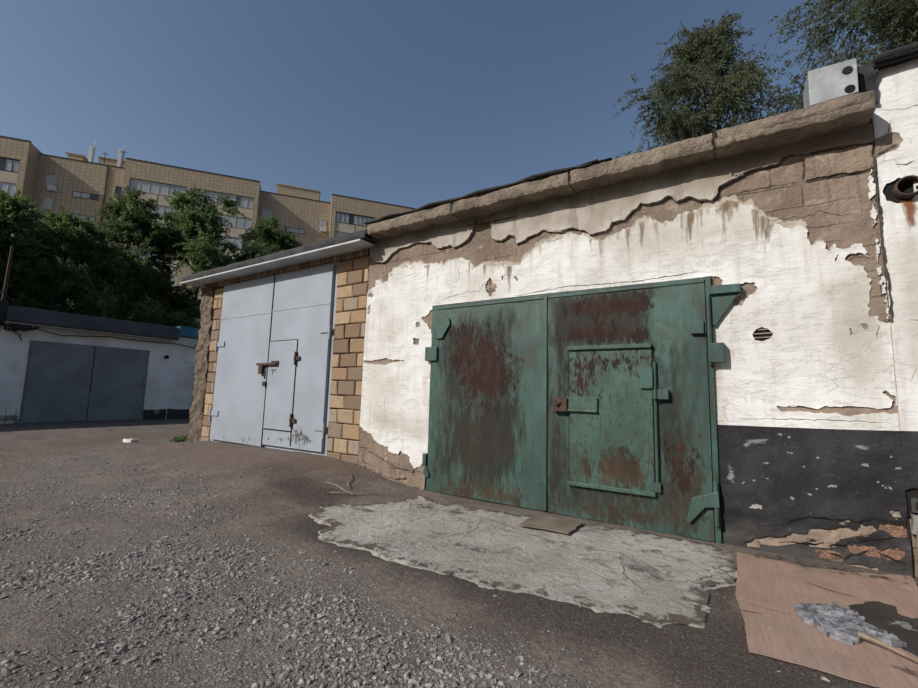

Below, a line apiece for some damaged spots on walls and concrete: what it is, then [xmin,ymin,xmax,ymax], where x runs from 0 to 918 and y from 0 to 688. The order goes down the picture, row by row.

flaking render [368,123,903,335]
rust [903,200,916,224]
rust [550,289,658,402]
flaking render [360,427,427,484]
rust [437,315,524,508]
rust [546,371,705,538]
spalling [777,396,898,416]